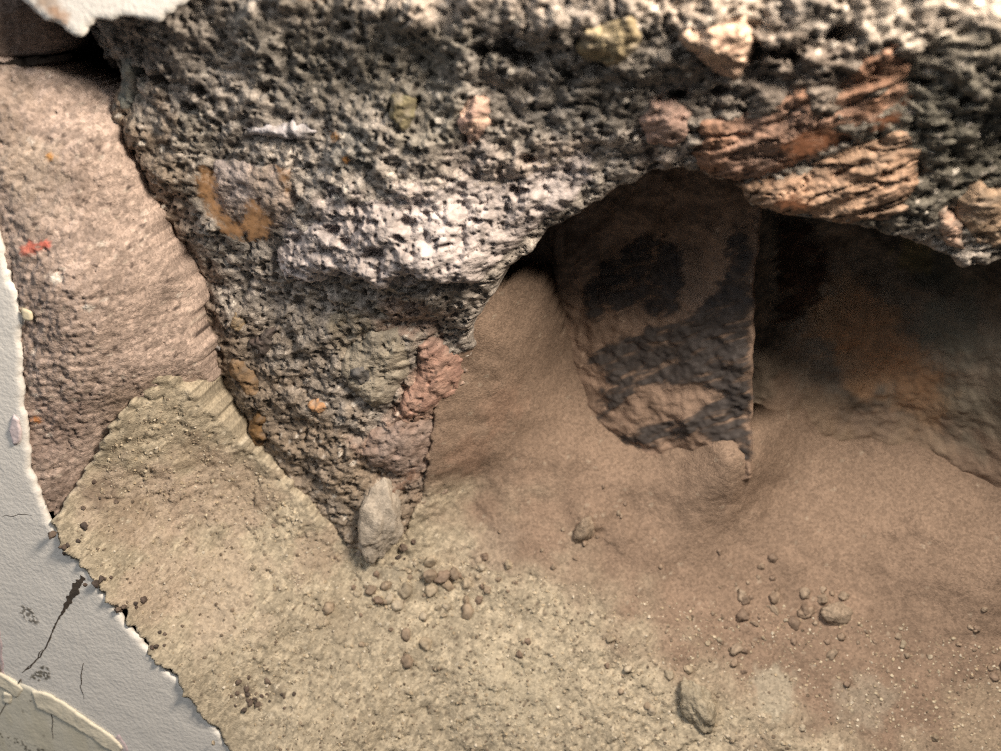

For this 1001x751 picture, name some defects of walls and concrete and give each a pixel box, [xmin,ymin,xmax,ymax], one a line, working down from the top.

rust [196,168,272,241]
spalling [0,0,1001,557]
water stain [589,226,754,459]
crack [0,575,86,714]
peeling [0,632,128,751]